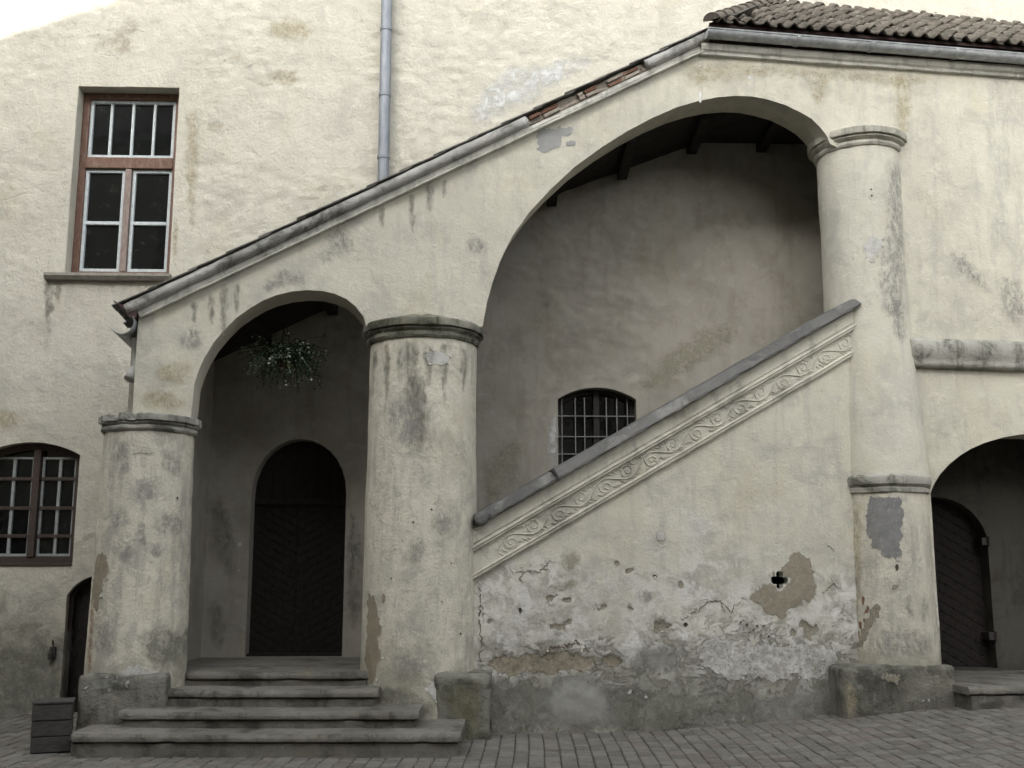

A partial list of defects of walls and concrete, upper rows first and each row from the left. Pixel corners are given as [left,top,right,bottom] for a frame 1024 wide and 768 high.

leakage [884,170,902,335]
peeling [92,553,109,613]
peeling [364,590,385,686]
crack [510,559,554,583]
spalling [488,650,624,678]
spalling [652,619,688,634]
crack [681,599,741,620]
peeling [697,619,838,683]